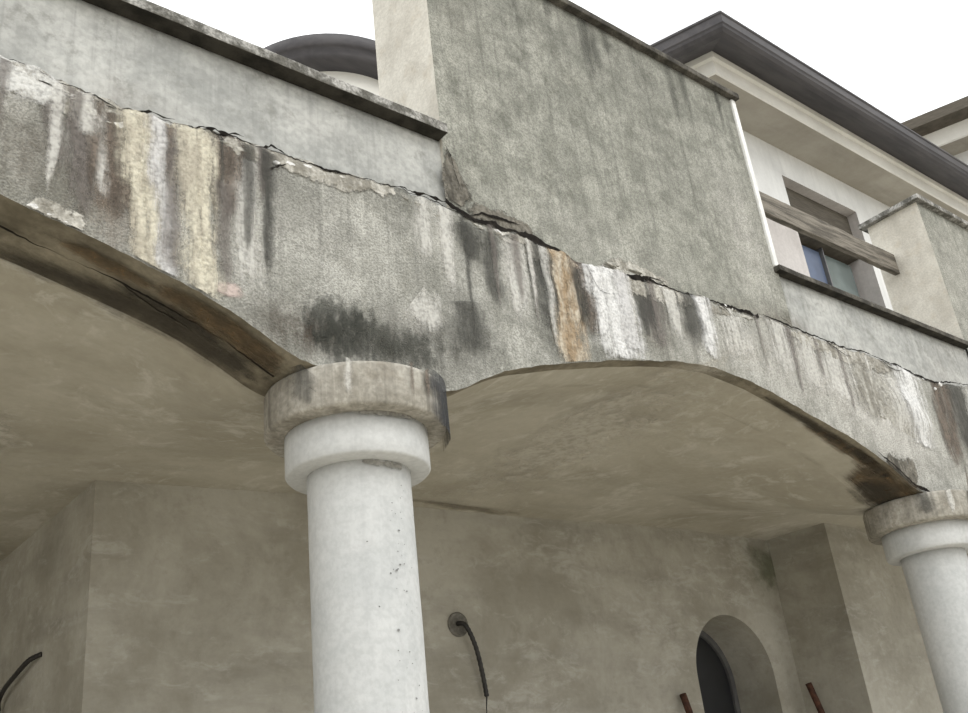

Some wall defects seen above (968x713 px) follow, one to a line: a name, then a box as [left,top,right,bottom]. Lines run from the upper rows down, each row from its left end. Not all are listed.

water stain [0,55,275,299]
water stain [307,294,451,446]
crack [0,59,967,385]
water stain [418,196,560,348]
spalling [442,147,555,265]
corrosion [548,248,589,362]
water stain [573,260,750,359]
spalling [602,258,736,317]
water stain [754,315,859,407]
water stain [888,366,968,486]